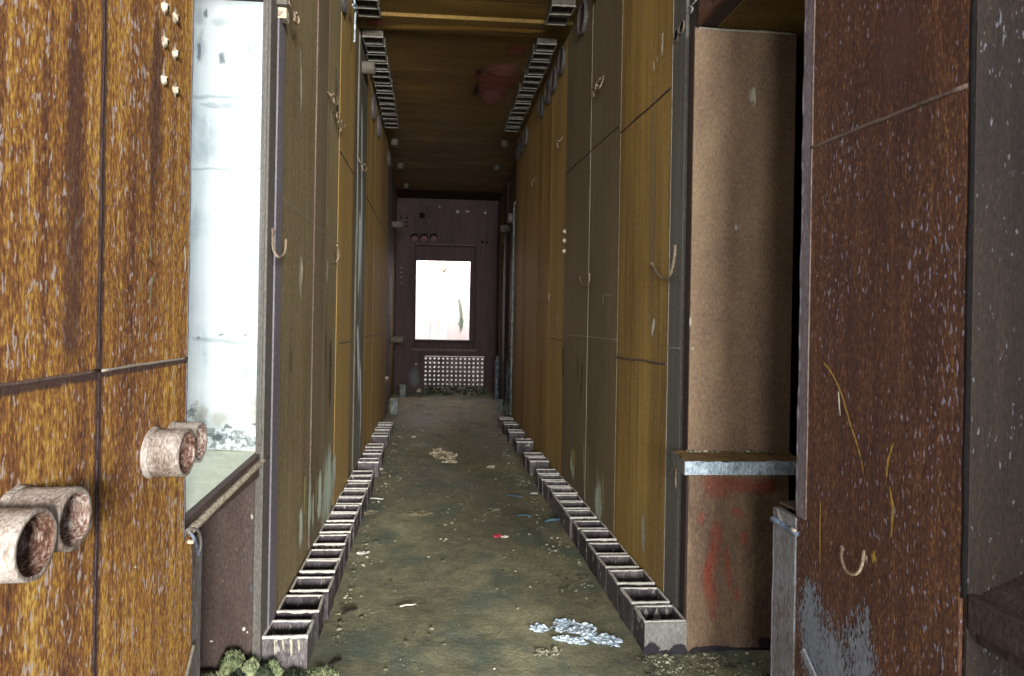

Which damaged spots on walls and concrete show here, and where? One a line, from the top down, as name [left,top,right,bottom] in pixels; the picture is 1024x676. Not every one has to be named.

rust [63,0,83,365]
rust [148,21,162,191]
peeling [795,572,882,676]